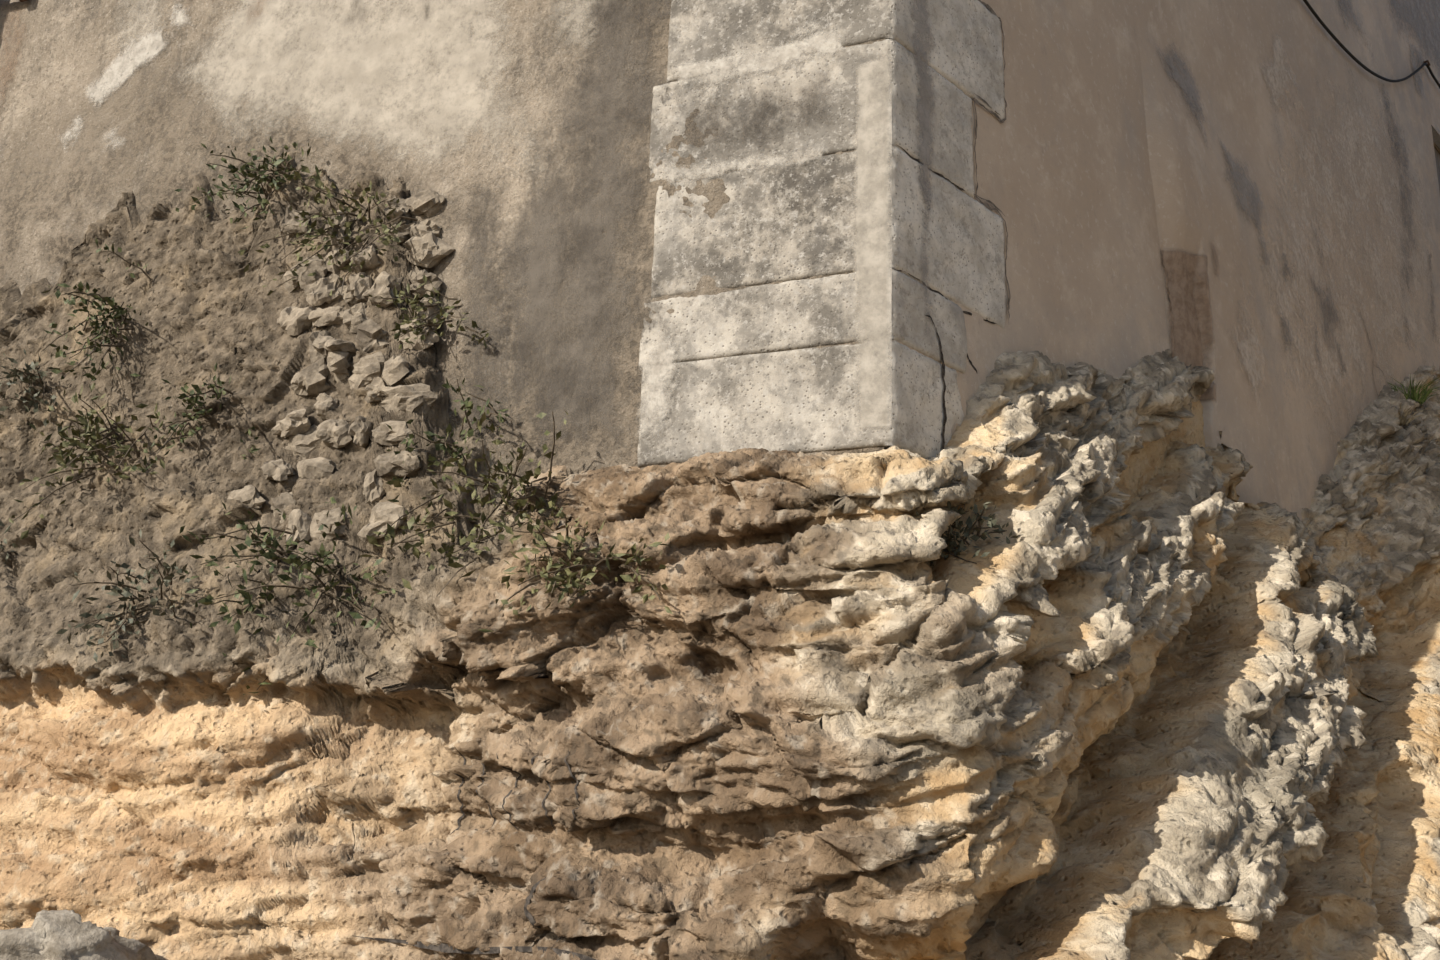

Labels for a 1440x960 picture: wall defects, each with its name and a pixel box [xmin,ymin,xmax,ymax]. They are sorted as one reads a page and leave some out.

flaking render [227,189,458,546]
damp [463,0,671,448]